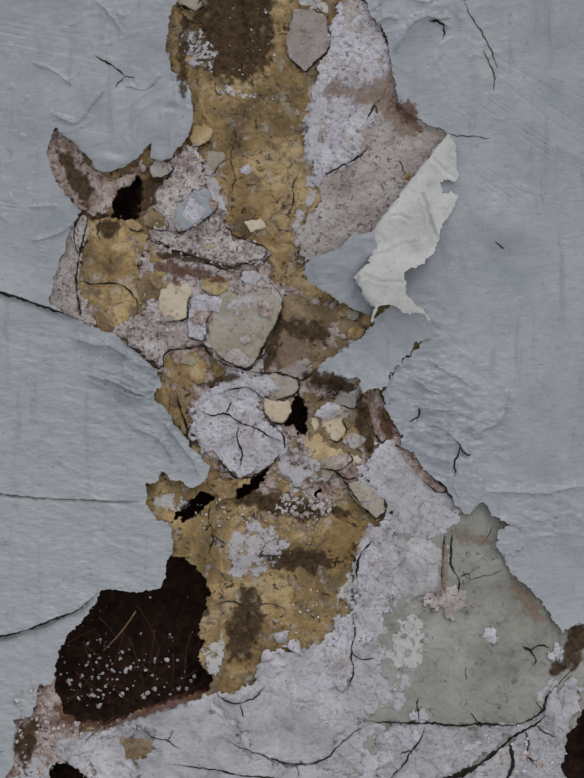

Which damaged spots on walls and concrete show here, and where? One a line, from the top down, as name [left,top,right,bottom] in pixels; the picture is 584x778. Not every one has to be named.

crack [96,56,134,86]
crack [0,215,140,319]
spalling [47,0,460,725]
crack [3,494,139,502]
crack [0,602,88,638]
spalling [6,386,584,778]
crack [145,658,584,778]